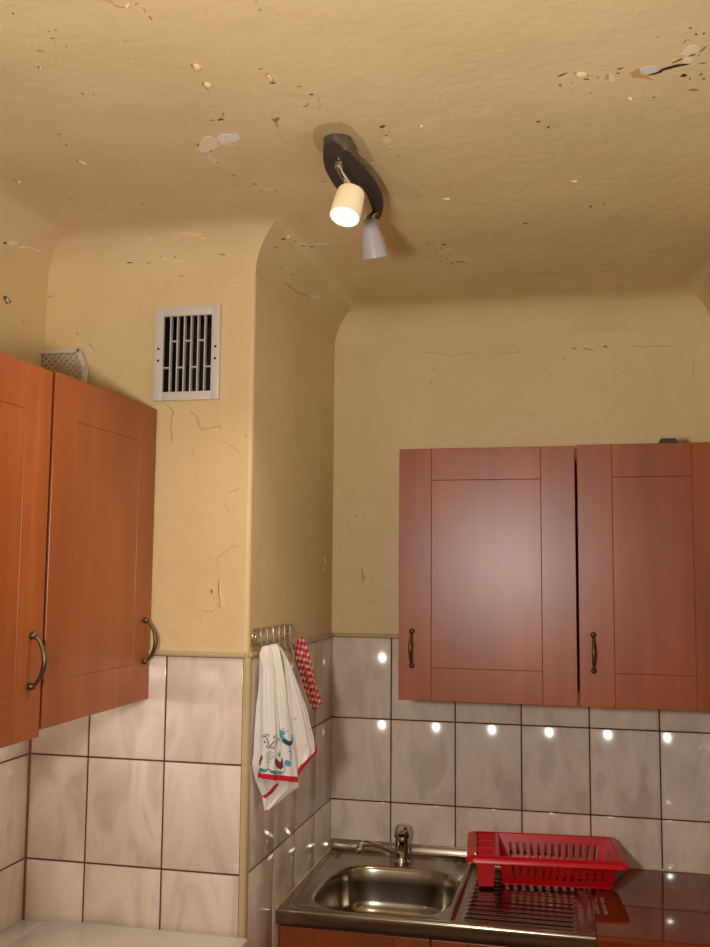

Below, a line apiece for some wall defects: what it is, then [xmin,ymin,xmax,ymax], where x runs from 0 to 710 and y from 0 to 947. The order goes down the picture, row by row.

peeling [640,66,659,74]
peeling [663,27,710,80]
peeling [197,133,240,169]